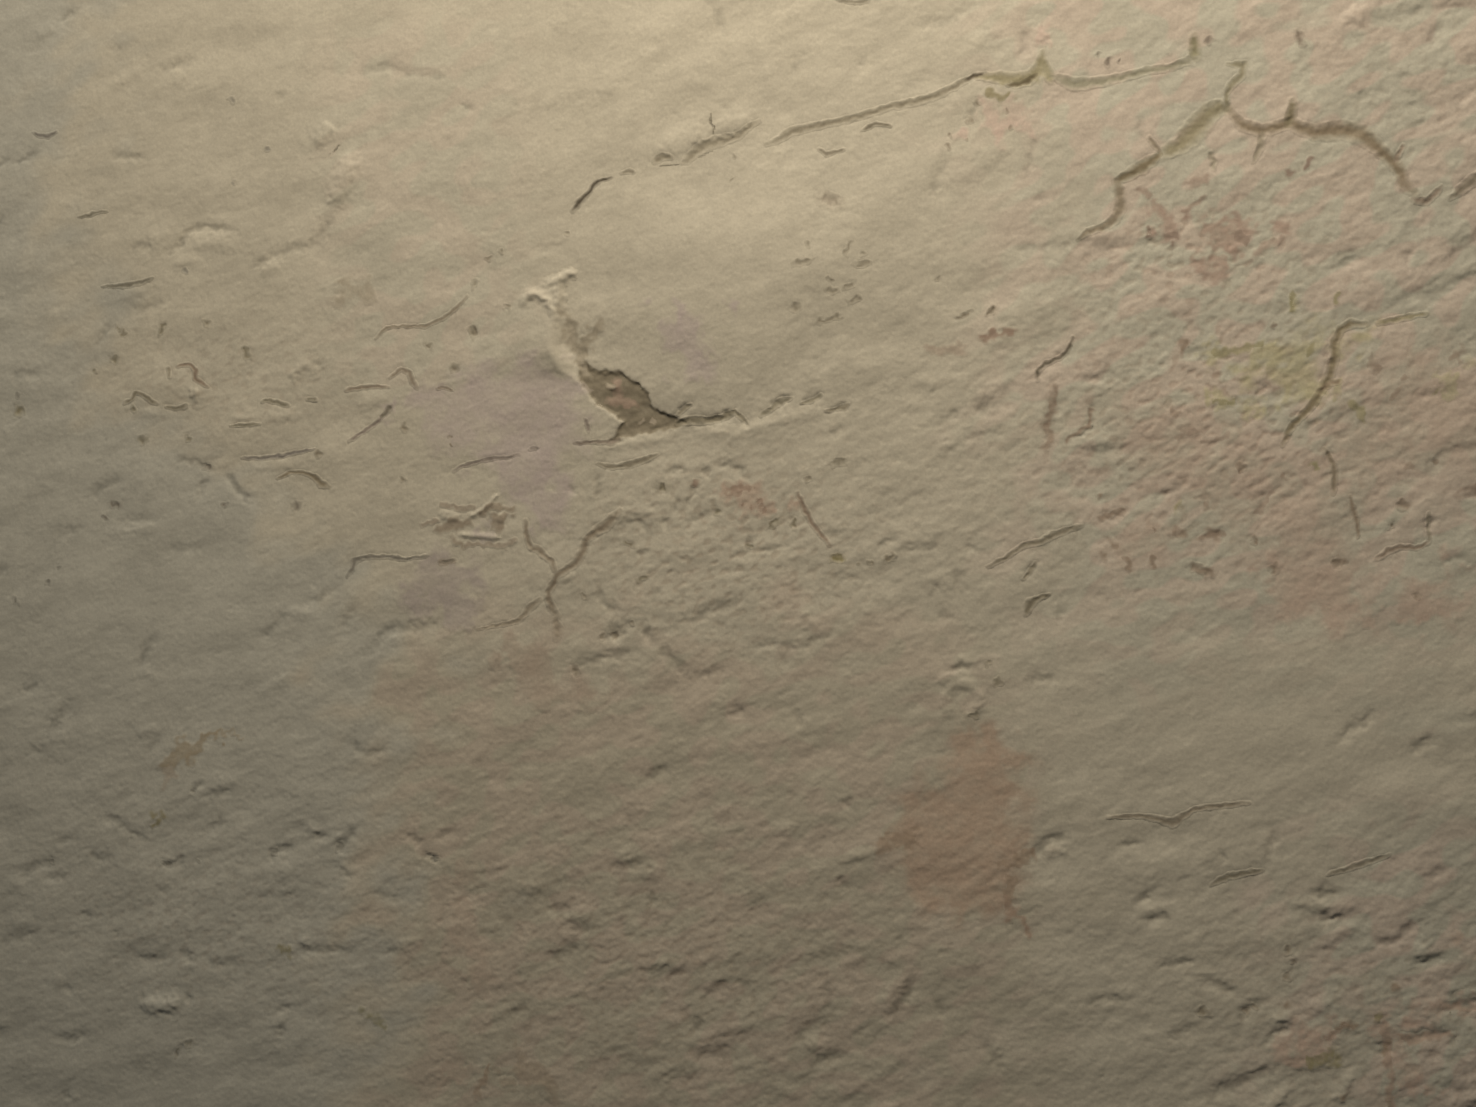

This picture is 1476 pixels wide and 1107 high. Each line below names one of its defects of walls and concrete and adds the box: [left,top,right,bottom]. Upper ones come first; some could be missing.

crack [569,30,1476,243]
peeling [501,266,578,320]
spalling [576,362,681,446]
crack [451,392,851,474]
crack [1279,310,1433,562]
crack [795,489,833,548]
crack [345,553,458,580]
crack [475,506,624,644]
damp [868,709,1060,943]